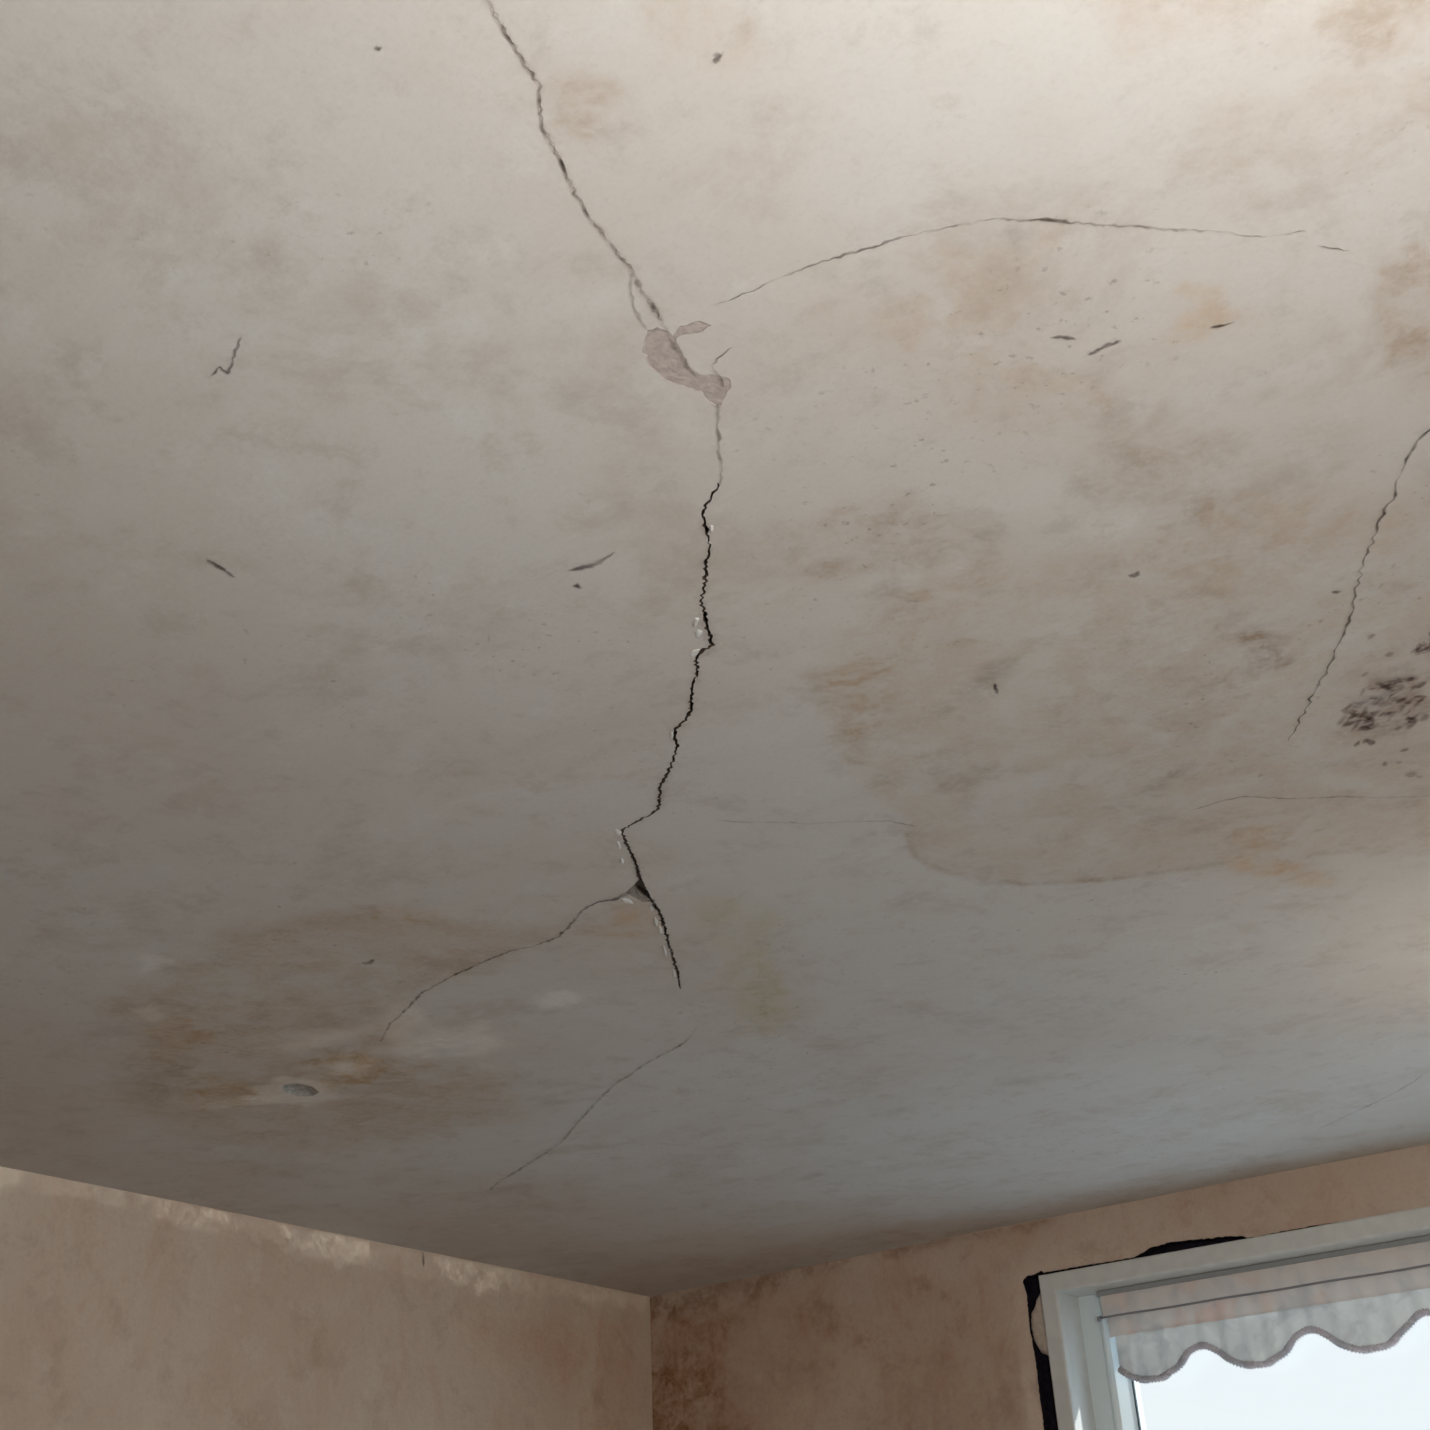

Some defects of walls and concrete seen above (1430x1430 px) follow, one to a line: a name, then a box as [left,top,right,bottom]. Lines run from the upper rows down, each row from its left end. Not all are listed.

spalling [642,321,731,408]
crack [1366,430,1430,555]
crack [590,483,720,989]
crack [1288,587,1356,739]